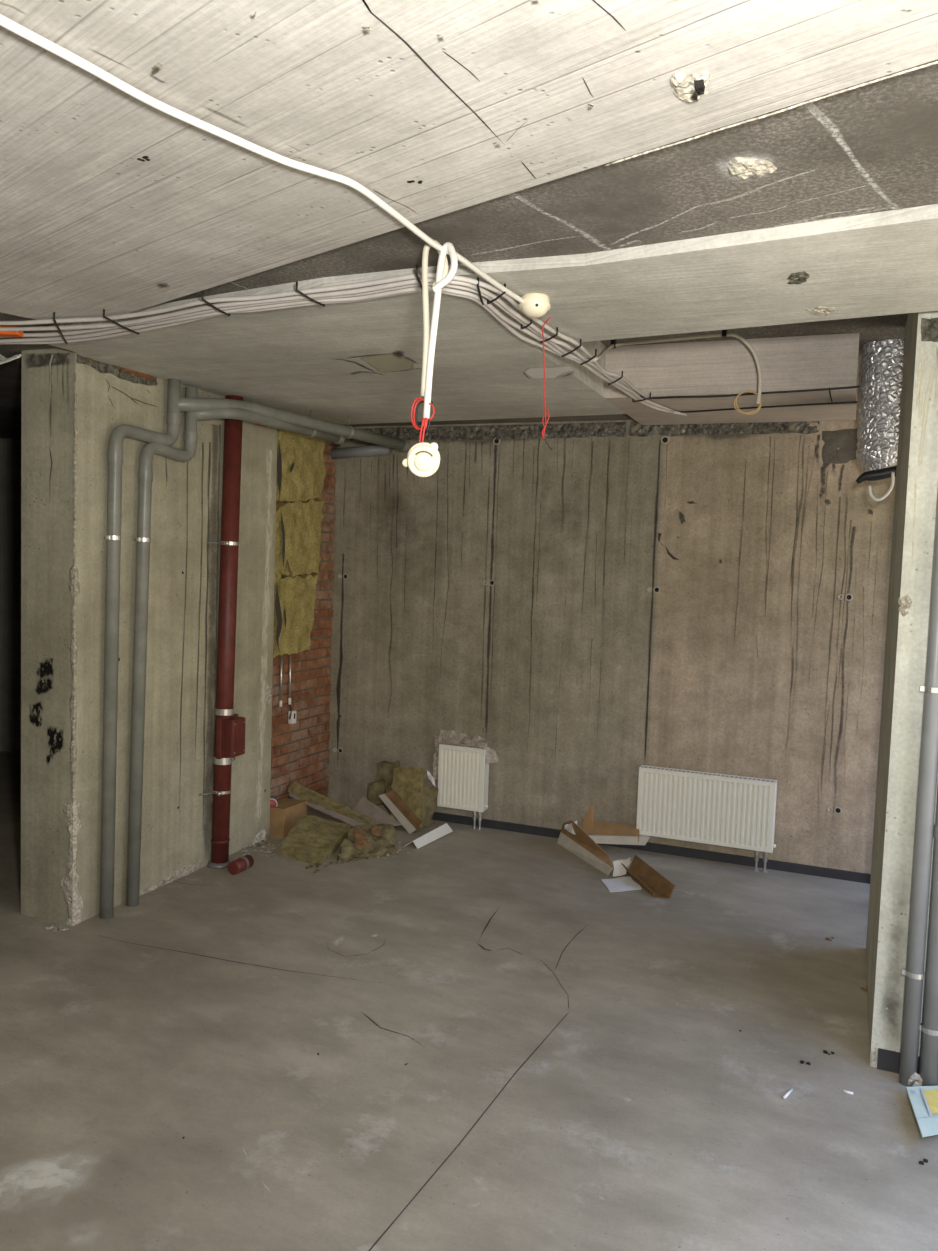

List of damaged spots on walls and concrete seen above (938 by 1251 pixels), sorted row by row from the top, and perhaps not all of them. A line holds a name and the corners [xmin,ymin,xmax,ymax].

crack [362,0,536,179]
spalling [670,70,710,102]
spalling [726,157,777,180]
spalling [60,370,83,926]
crack [477,909,583,1008]
crack [364,1014,418,1043]